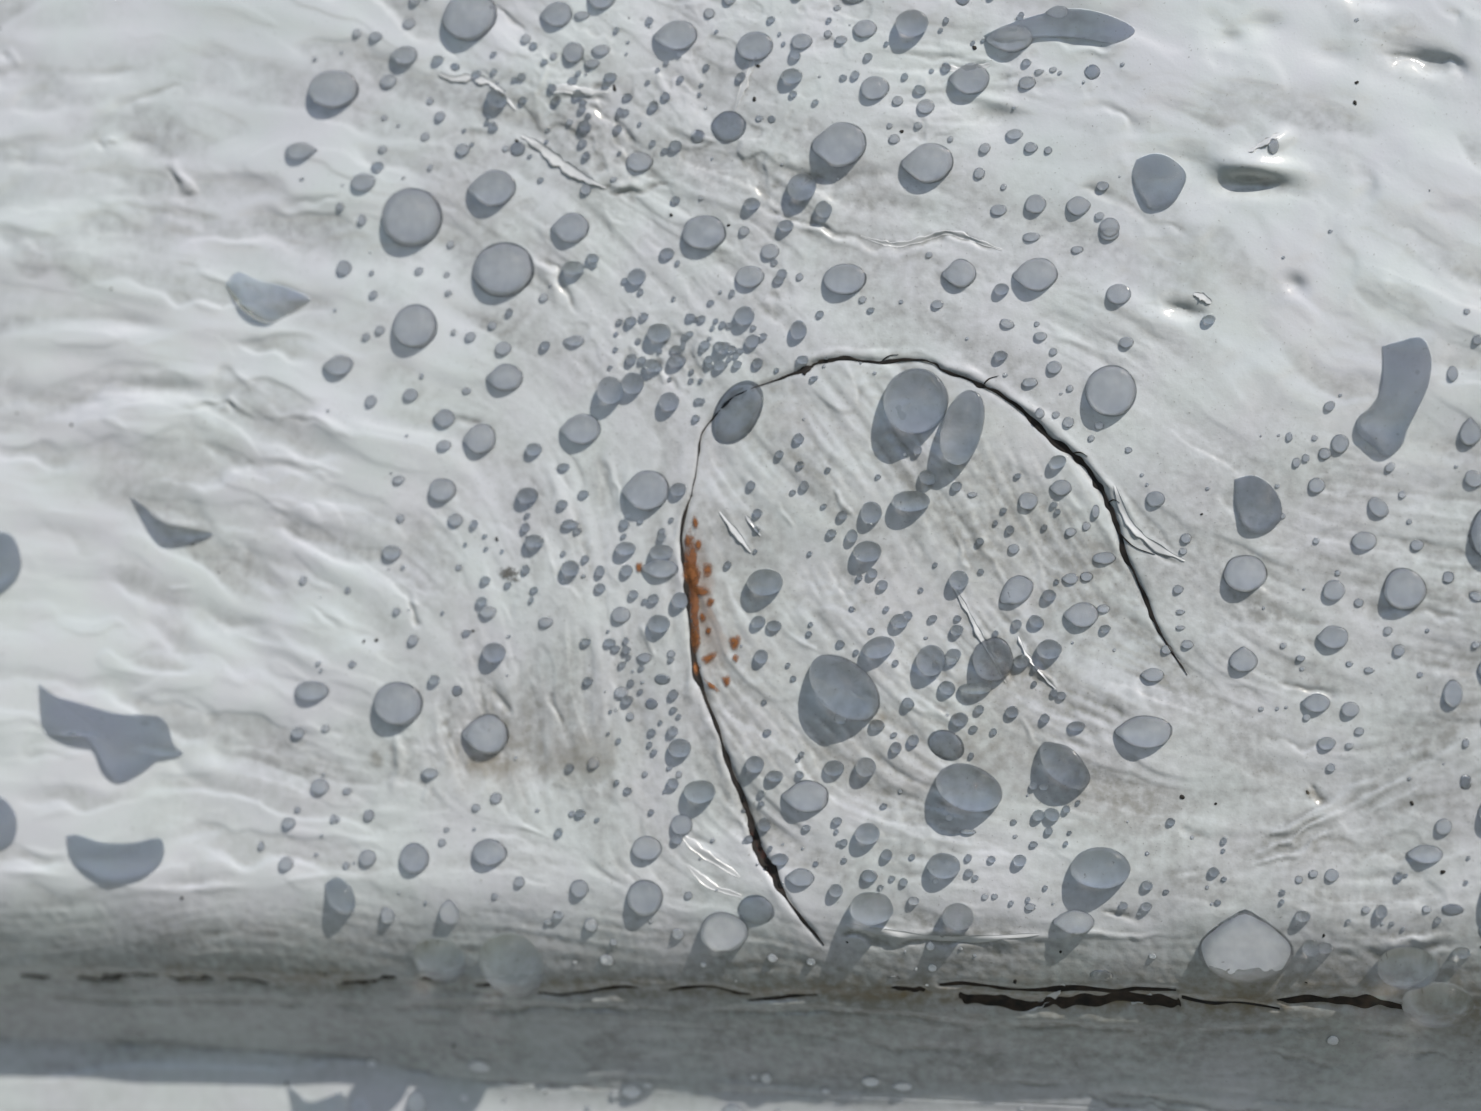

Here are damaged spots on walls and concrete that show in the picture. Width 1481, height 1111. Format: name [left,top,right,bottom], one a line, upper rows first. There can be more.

crack [757,354,1187,674]
rust [684,517,740,691]
crack [680,418,824,945]
crack [20,973,268,984]
crack [342,976,491,987]
crack [538,986,817,1001]
crack [891,981,1402,1011]